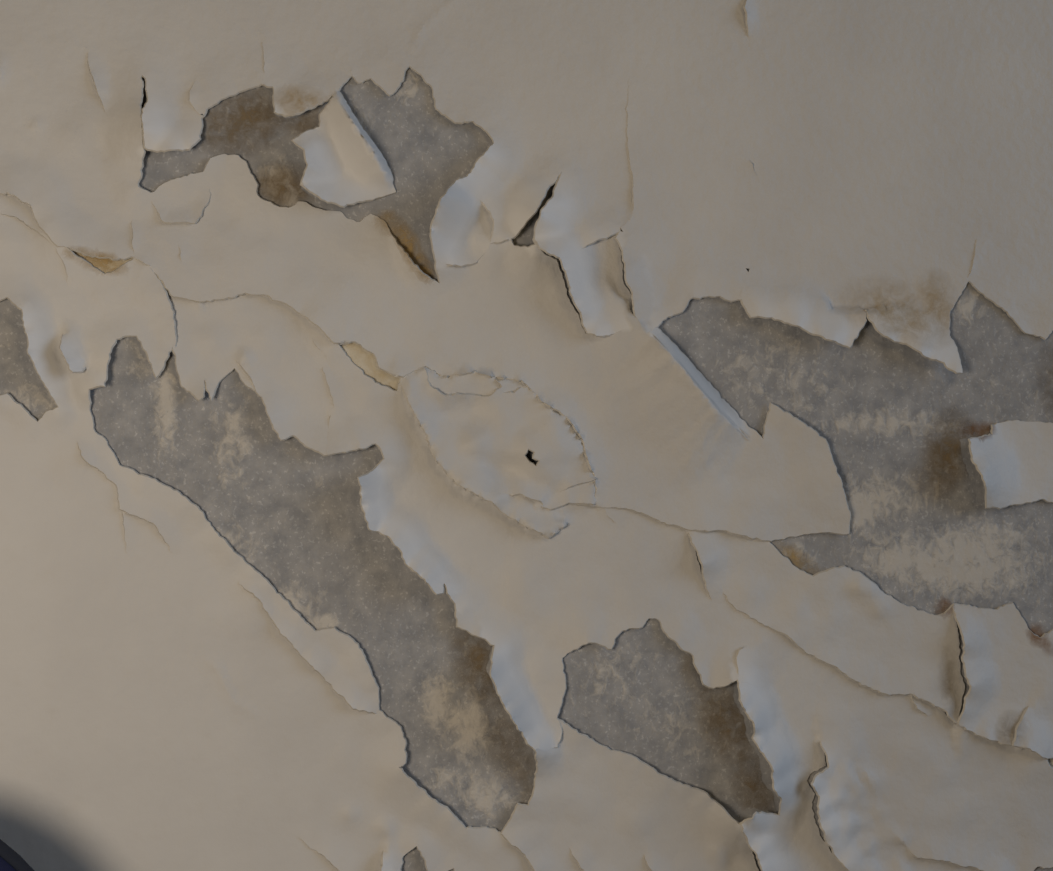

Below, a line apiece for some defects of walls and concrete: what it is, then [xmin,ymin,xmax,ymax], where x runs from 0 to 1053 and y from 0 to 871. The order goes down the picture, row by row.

peeling [0,286,931,871]
peeling [128,33,1053,649]